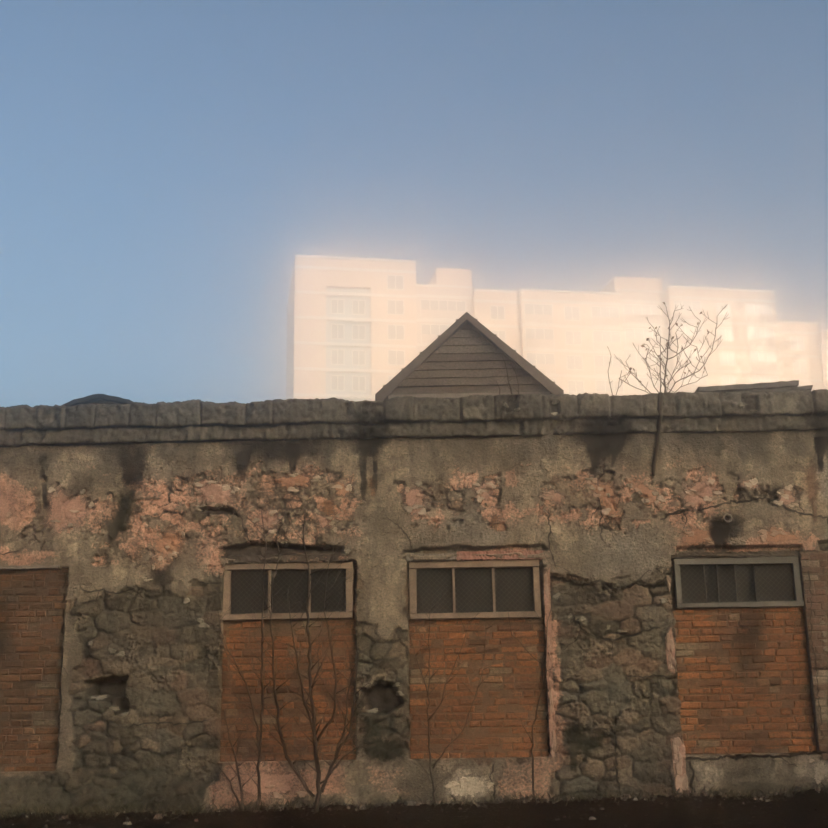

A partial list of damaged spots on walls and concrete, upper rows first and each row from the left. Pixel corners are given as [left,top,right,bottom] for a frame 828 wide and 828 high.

leakage [578,409,631,475]
leakage [808,407,828,470]
peeling [45,487,95,534]
leakage [107,447,148,542]
peeling [195,480,239,514]
peeling [268,473,323,492]
peeling [584,477,620,520]
crack [660,487,828,531]
peeling [773,484,799,507]
spalling [224,542,350,557]
peeling [683,527,714,547]
crack [686,750,826,793]